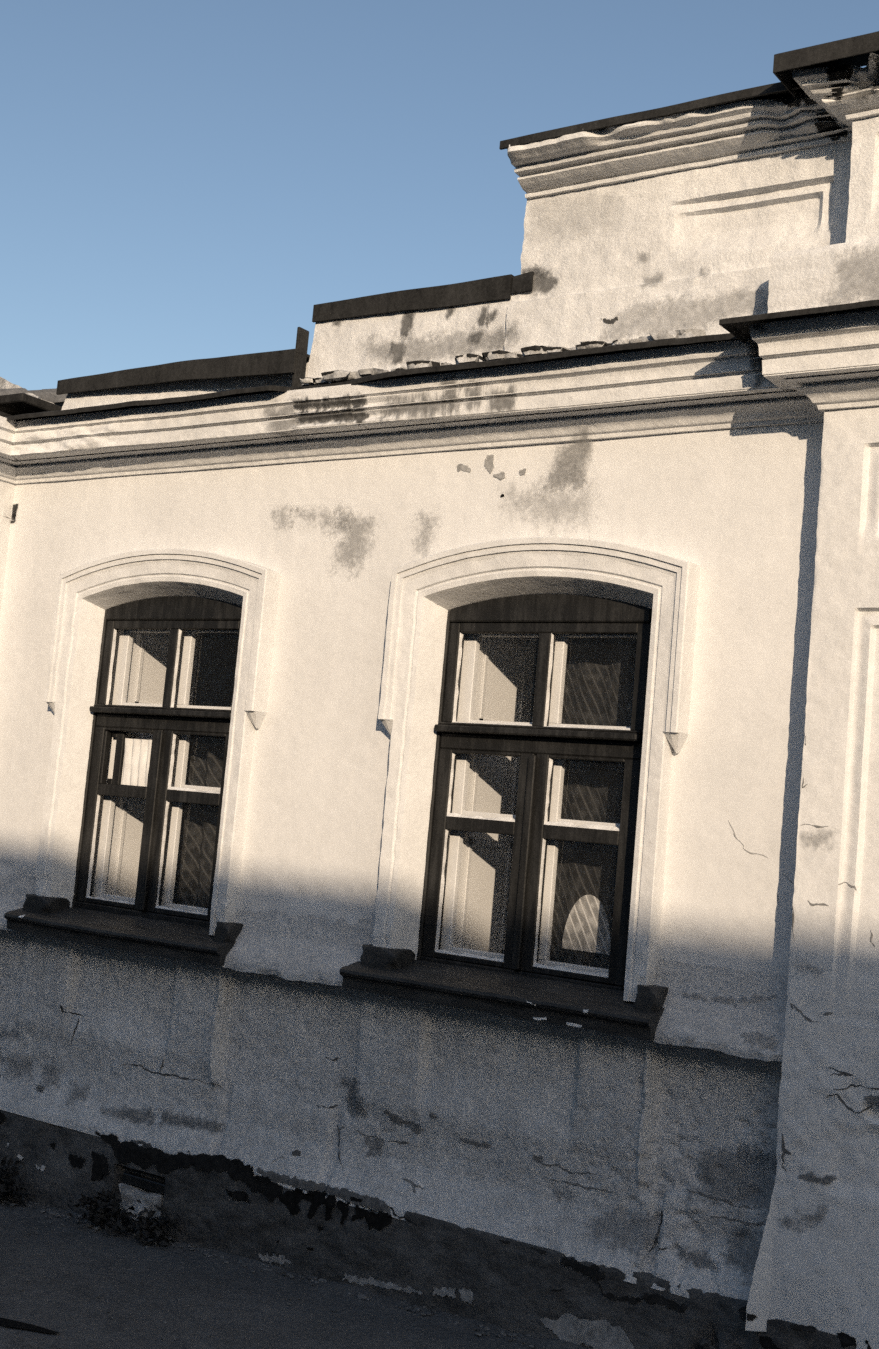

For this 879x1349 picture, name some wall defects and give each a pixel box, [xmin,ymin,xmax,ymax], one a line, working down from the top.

spalling [773,64,854,141]
water stain [523,267,557,292]
water stain [748,323,764,386]
water stain [549,432,591,488]
crack [728,820,856,941]
crack [121,1060,223,1088]
crack [826,1067,879,1113]
peeling [68,1131,392,1231]
spalling [342,1274,475,1305]
spalling [541,1313,634,1349]
spalling [560,1256,687,1313]
peeling [738,1305,758,1321]